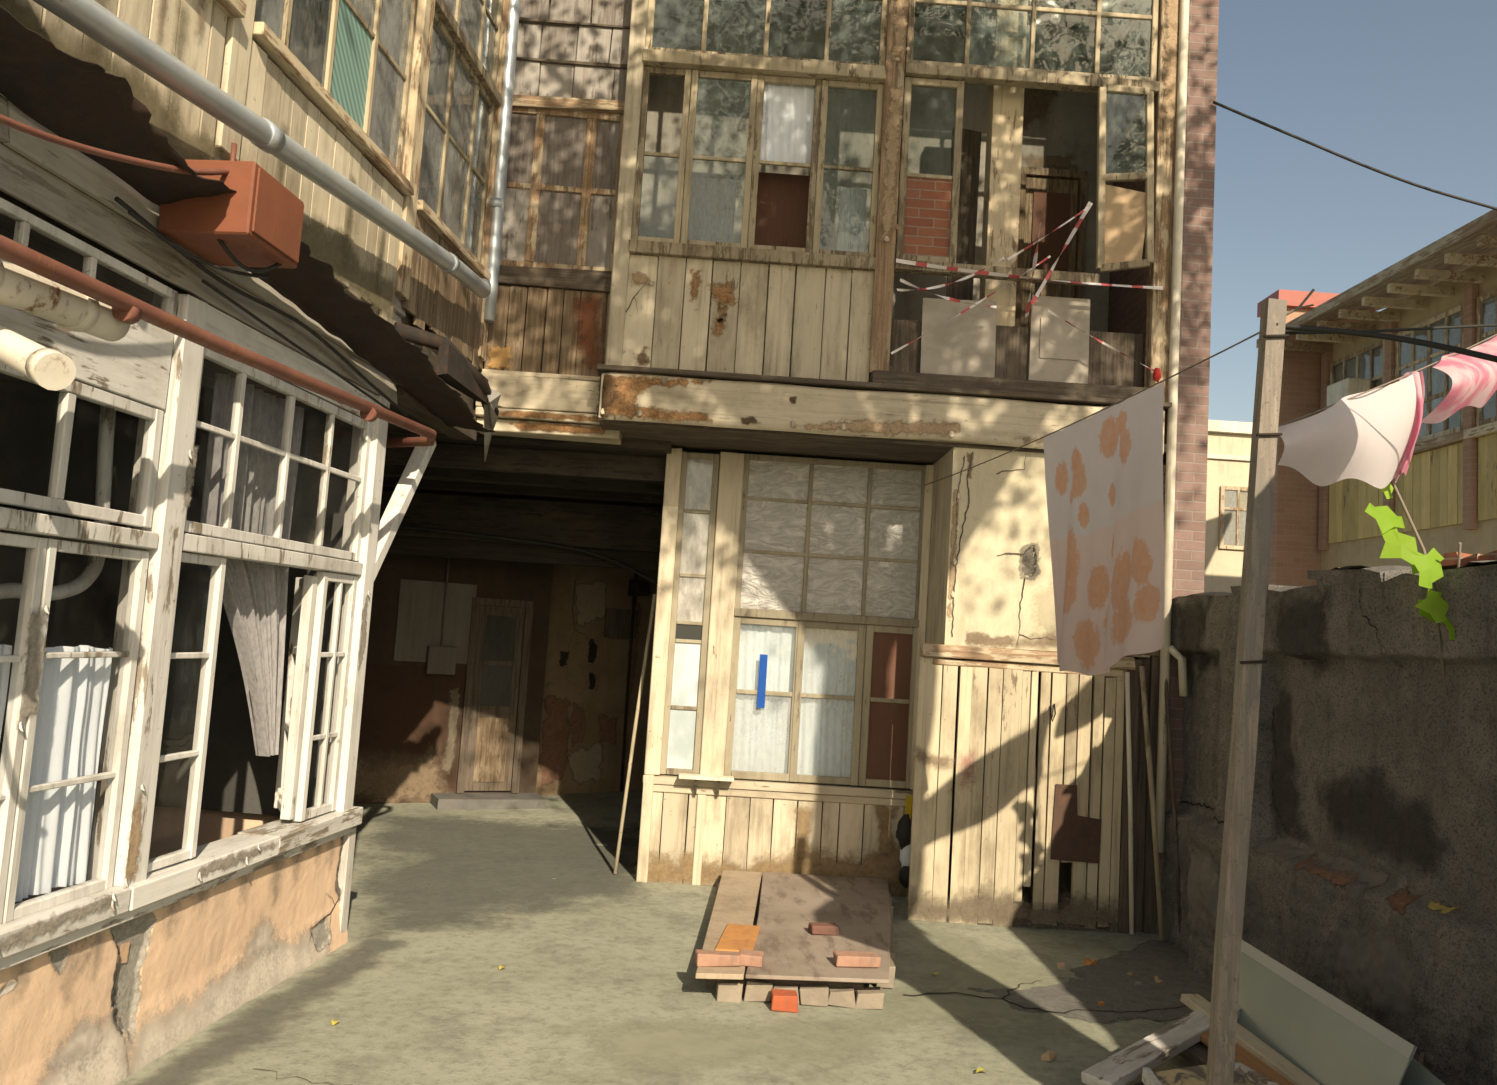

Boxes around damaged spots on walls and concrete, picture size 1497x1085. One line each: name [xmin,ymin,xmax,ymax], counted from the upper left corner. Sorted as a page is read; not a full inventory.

peeling [789,397,960,437]
crack [951,451,1026,637]
crack [997,553,1056,643]
peeling [17,605,50,732]
flaking render [538,695,571,786]
spalling [0,784,156,1043]
peeling [198,842,279,881]
spalling [310,918,331,952]
spalling [335,836,344,901]
damp [1326,774,1444,871]